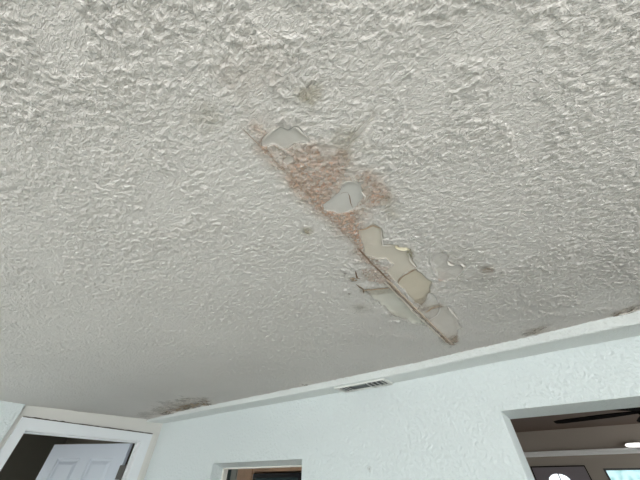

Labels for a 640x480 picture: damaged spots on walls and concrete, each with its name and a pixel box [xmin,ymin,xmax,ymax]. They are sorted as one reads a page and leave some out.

peeling [323,181,366,214]
crack [244,130,451,344]
peeling [357,224,417,283]
peeling [363,288,461,341]